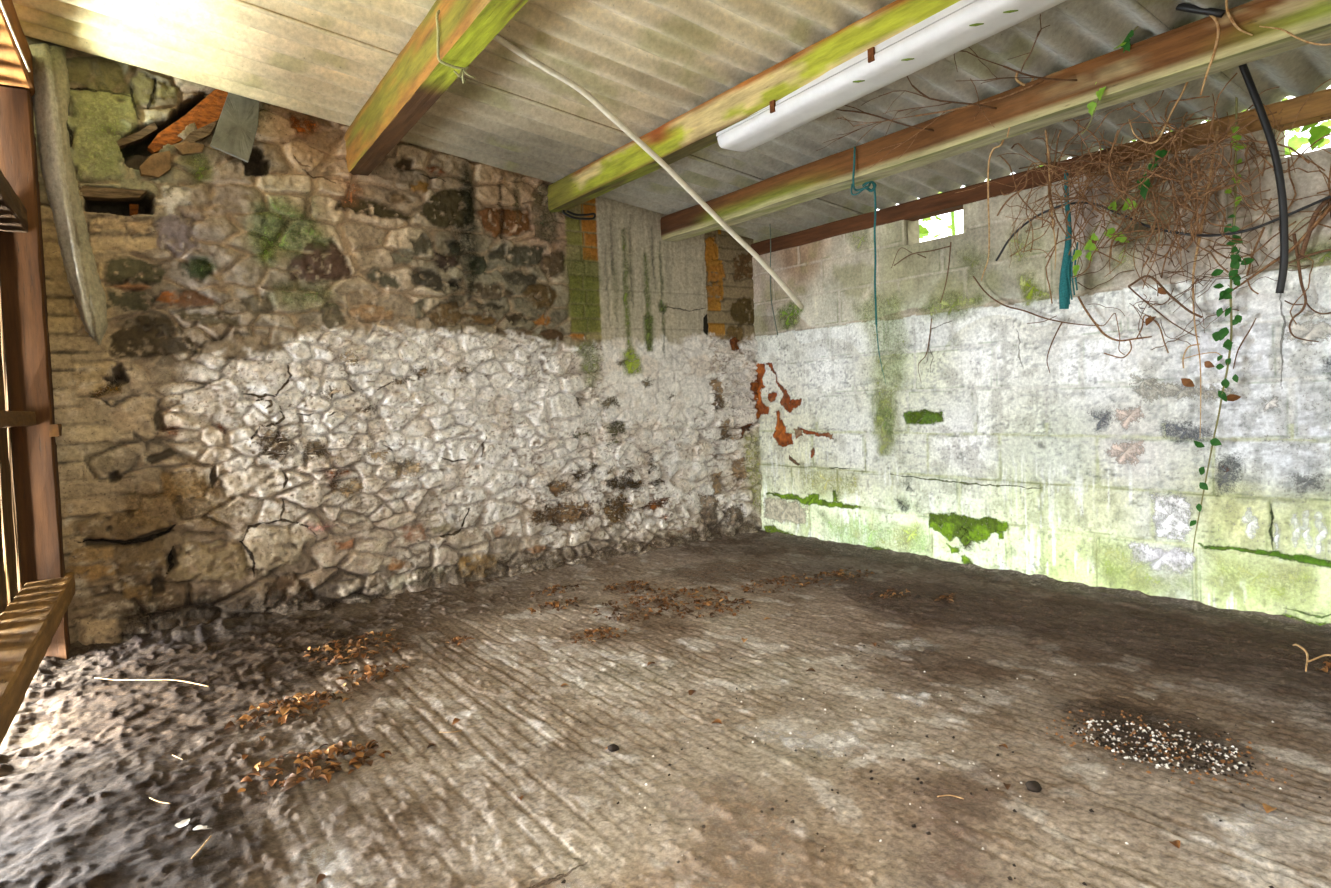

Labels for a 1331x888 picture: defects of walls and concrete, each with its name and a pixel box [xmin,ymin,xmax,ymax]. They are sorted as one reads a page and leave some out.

leakage [605,223,666,351]
peeling [709,362,834,466]
leakage [1215,454,1242,495]
leakage [1292,474,1323,493]
crack [239,471,316,576]
leakage [1242,508,1258,538]
leakage [1274,511,1327,553]